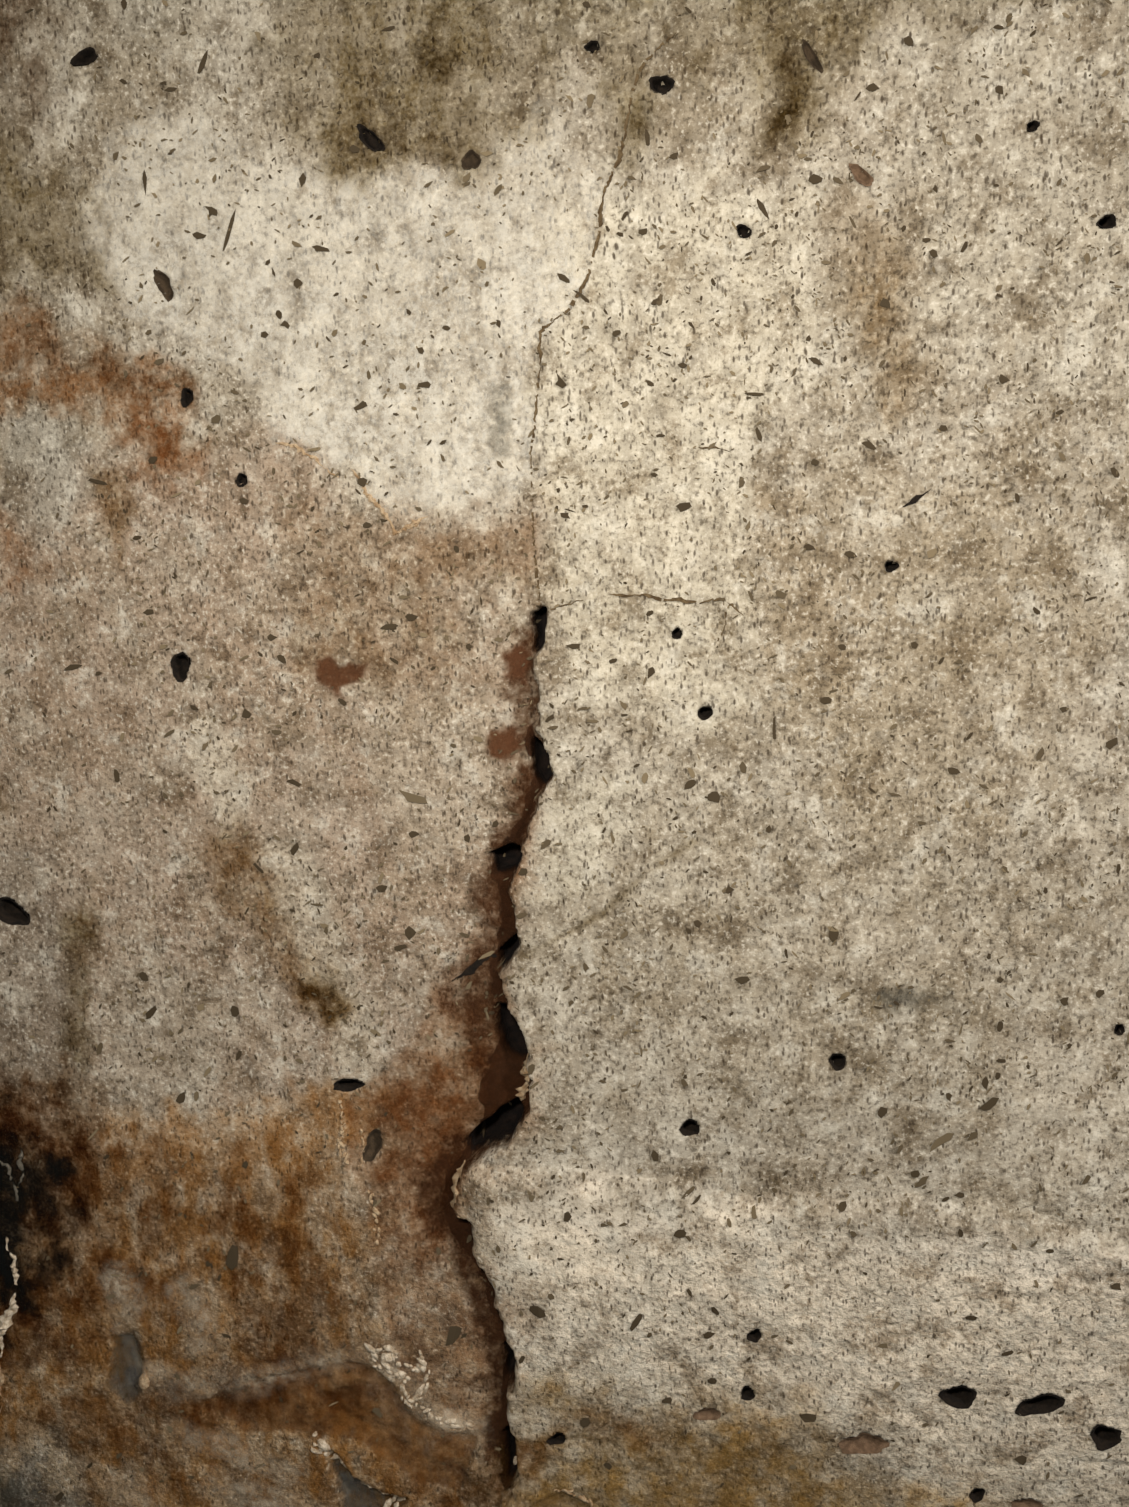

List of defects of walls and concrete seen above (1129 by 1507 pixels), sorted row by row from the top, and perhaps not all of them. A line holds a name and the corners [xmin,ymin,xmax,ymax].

crack [529,34,743,651]
water stain [0,1100,88,1361]
spalling [206,1342,477,1507]
corrosion [427,1133,513,1459]
crack [443,723,553,1490]
corrosion [468,864,530,1108]